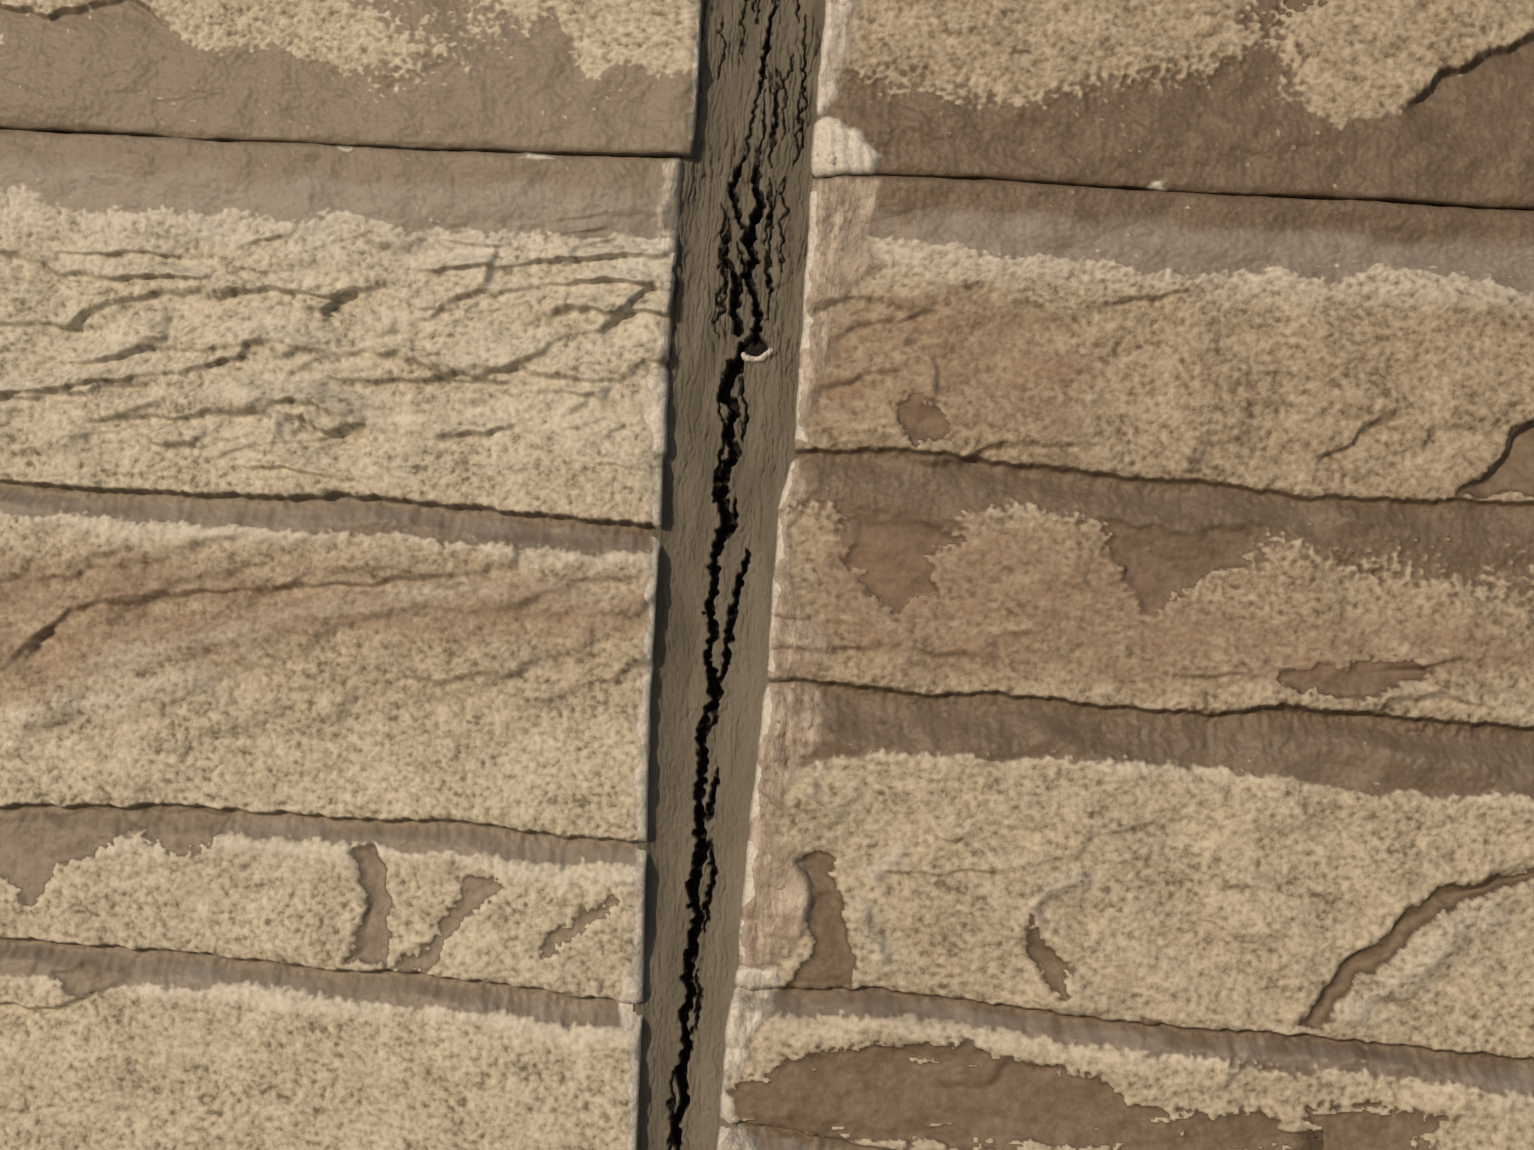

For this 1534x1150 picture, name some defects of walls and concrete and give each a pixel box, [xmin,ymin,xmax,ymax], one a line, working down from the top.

crack [668,0,808,1150]